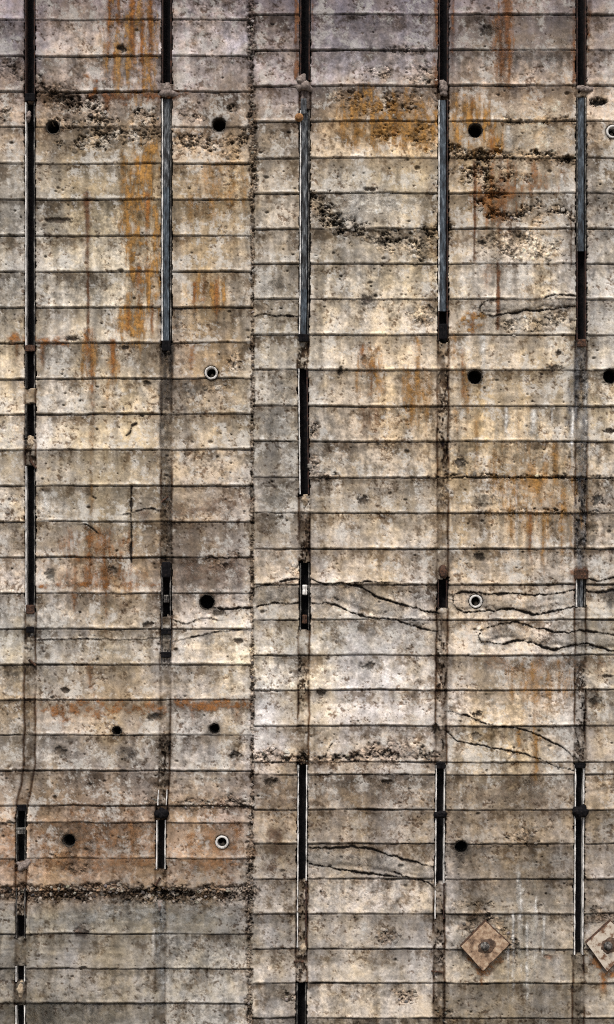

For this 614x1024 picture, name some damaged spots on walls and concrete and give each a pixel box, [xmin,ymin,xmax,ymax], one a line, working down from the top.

spalling [0,59,251,160]
rust [341,88,438,152]
rust [110,141,161,377]
spalling [310,189,455,265]
spalling [448,144,576,266]
spalling [405,301,437,327]
crack [480,294,575,316]
crack [175,577,614,651]
spalling [231,738,442,766]
crack [442,714,584,771]
spalling [0,850,261,905]
crack [309,845,433,887]